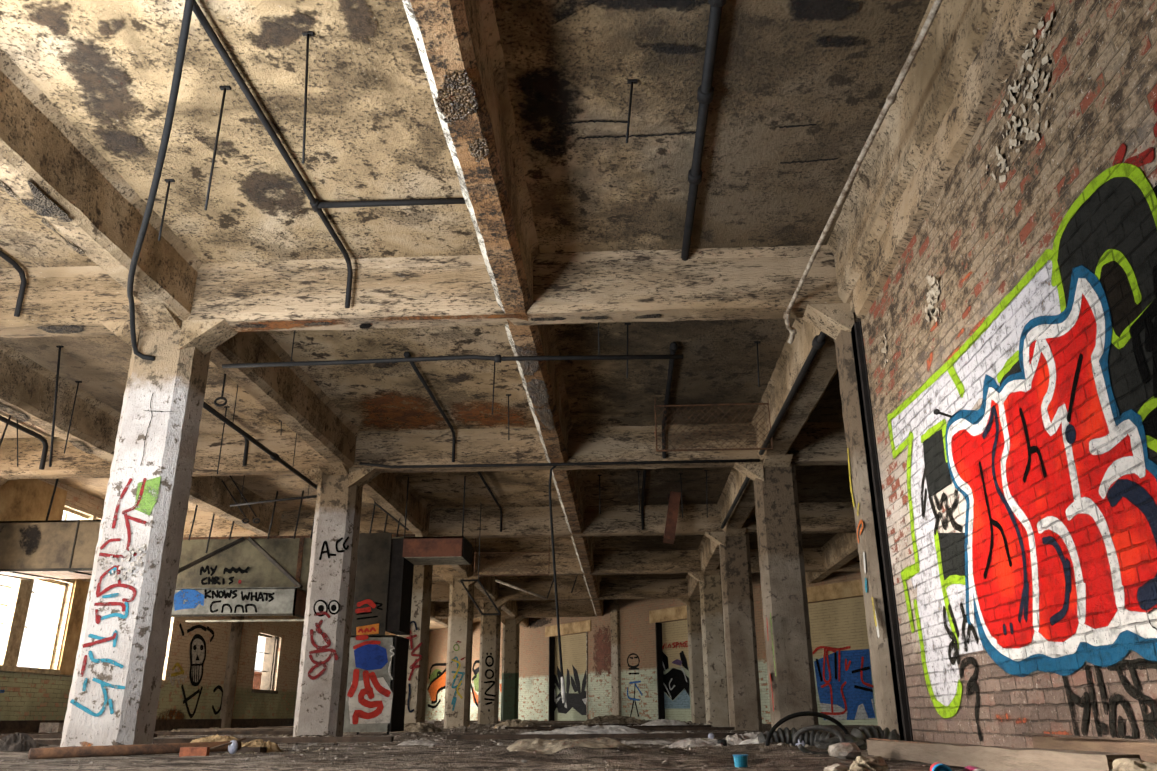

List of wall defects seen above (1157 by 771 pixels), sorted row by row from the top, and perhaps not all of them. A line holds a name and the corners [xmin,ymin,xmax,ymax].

leakage [547,0,709,24]
leakage [788,0,860,23]
leakage [639,44,697,55]
leakage [815,36,868,48]
leakage [24,0,150,159]
spalling [435,69,478,126]
leakage [516,67,583,165]
peeling [986,7,1053,183]
leakage [237,171,305,218]
leakage [19,525,41,556]